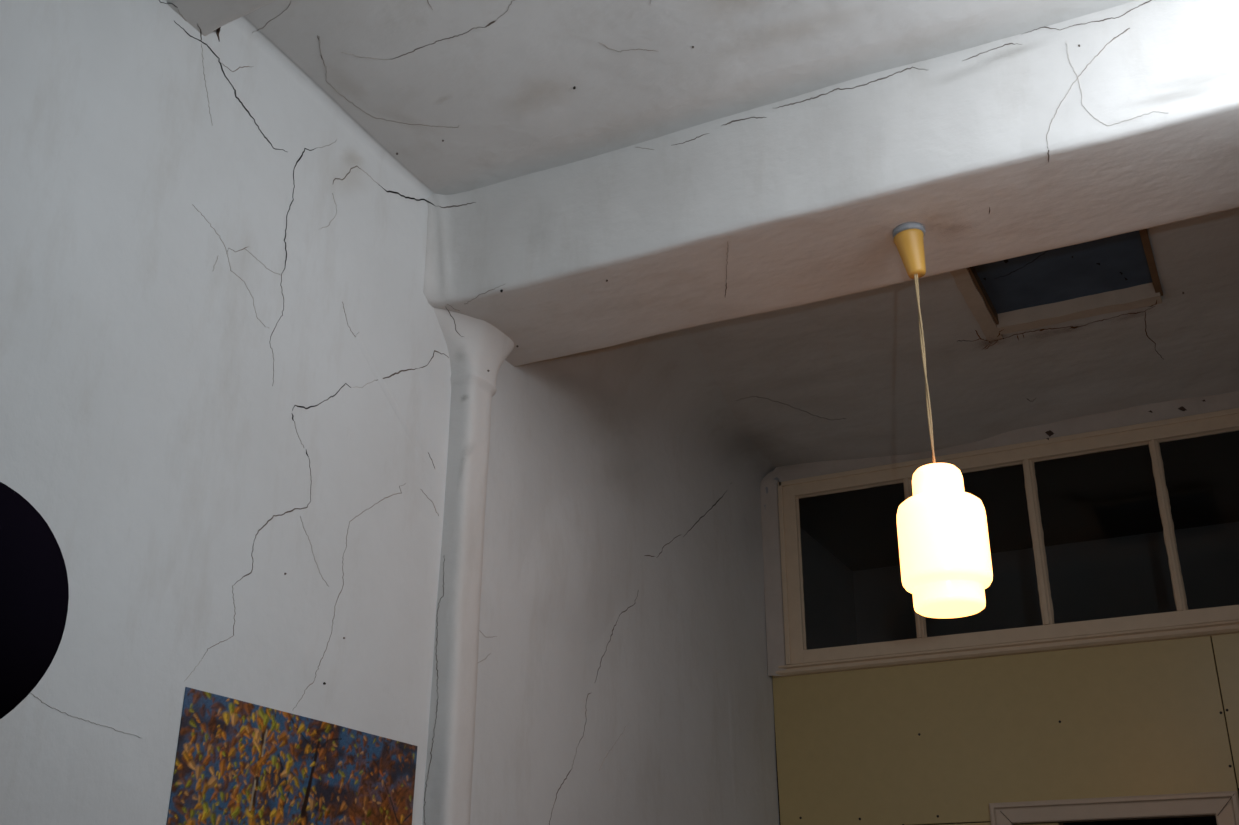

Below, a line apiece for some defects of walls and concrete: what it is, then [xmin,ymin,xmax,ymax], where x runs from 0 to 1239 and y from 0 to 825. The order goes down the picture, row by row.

crack [638,67,925,150]
crack [963,0,1163,162]
crack [159,0,514,711]
crack [644,483,731,557]
crack [549,594,638,825]